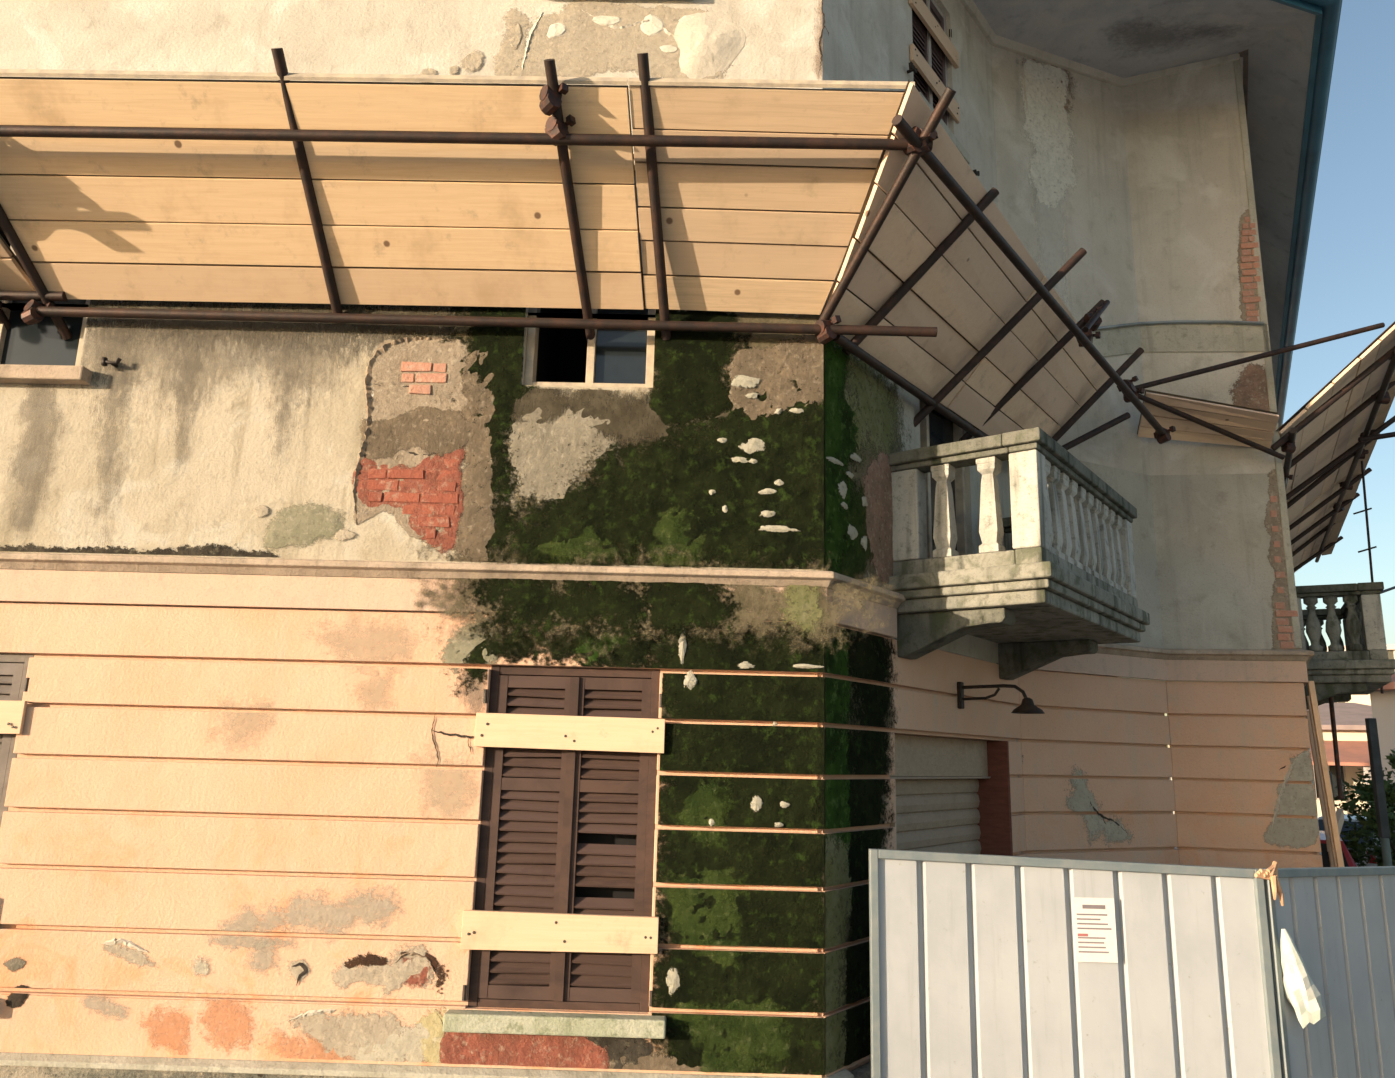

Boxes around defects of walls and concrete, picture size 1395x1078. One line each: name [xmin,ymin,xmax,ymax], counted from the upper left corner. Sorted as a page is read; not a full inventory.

crack [815,0,829,77]
peeling [1016,58,1081,299]
flaking render [1236,209,1261,321]
leakage [86,300,470,359]
peeling [253,336,620,562]
leakage [717,438,765,464]
leakage [758,479,799,532]
flaking render [1264,469,1300,650]
leakage [678,632,697,690]
leakage [750,795,763,812]
flaking render [273,941,717,1072]
leakage [666,968,680,995]